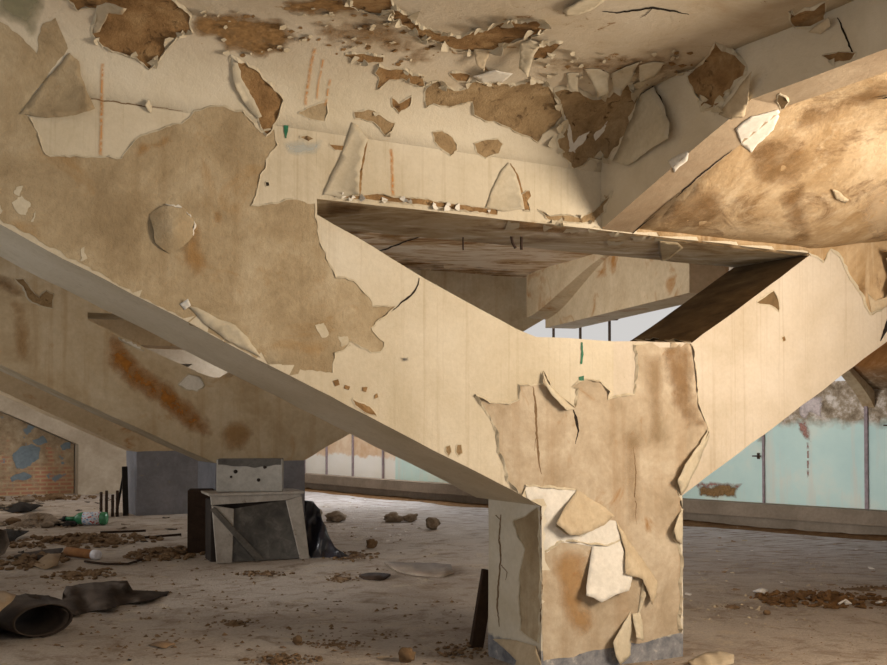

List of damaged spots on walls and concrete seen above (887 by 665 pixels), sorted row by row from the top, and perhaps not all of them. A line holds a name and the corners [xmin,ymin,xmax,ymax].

crack [602,7,689,17]
crack [92,98,179,111]
damp [847,92,879,104]
peeling [0,0,789,417]
crack [379,237,419,251]
peeling [635,229,887,315]
crack [380,280,419,320]
rust [112,343,202,428]
crack [532,386,542,474]
crack [572,410,580,444]
peeling [475,337,710,665]